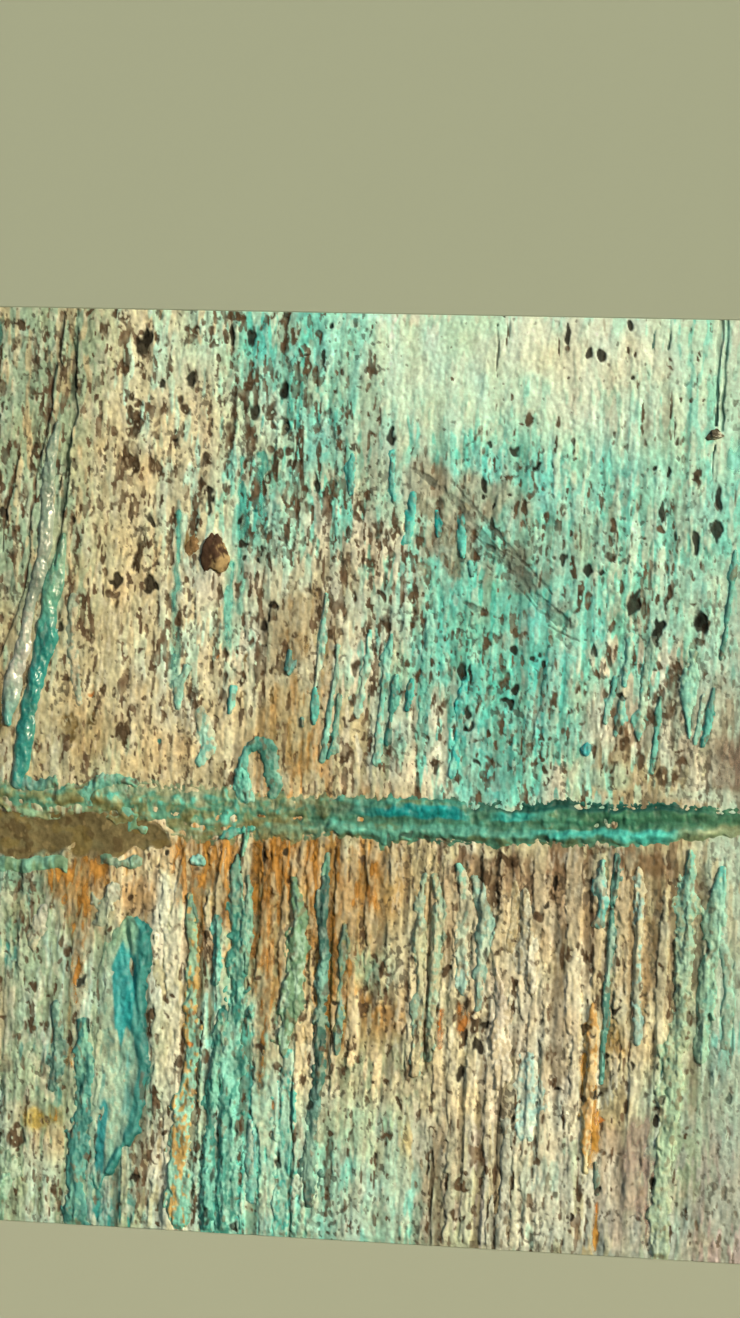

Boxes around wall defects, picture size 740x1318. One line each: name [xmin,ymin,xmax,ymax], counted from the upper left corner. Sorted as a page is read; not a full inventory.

rust [48,856,109,1003]
peeling [77,916,154,1190]
rust [173,834,232,955]
peeling [244,1017,295,1089]
rust [253,836,378,1083]
peeling [328,1039,353,1075]
peeling [358,961,384,1018]
rust [437,1005,468,1035]
peeling [0,1122,25,1155]
rust [581,1053,600,1164]
peeling [33,1163,62,1201]
peeling [453,1165,514,1221]